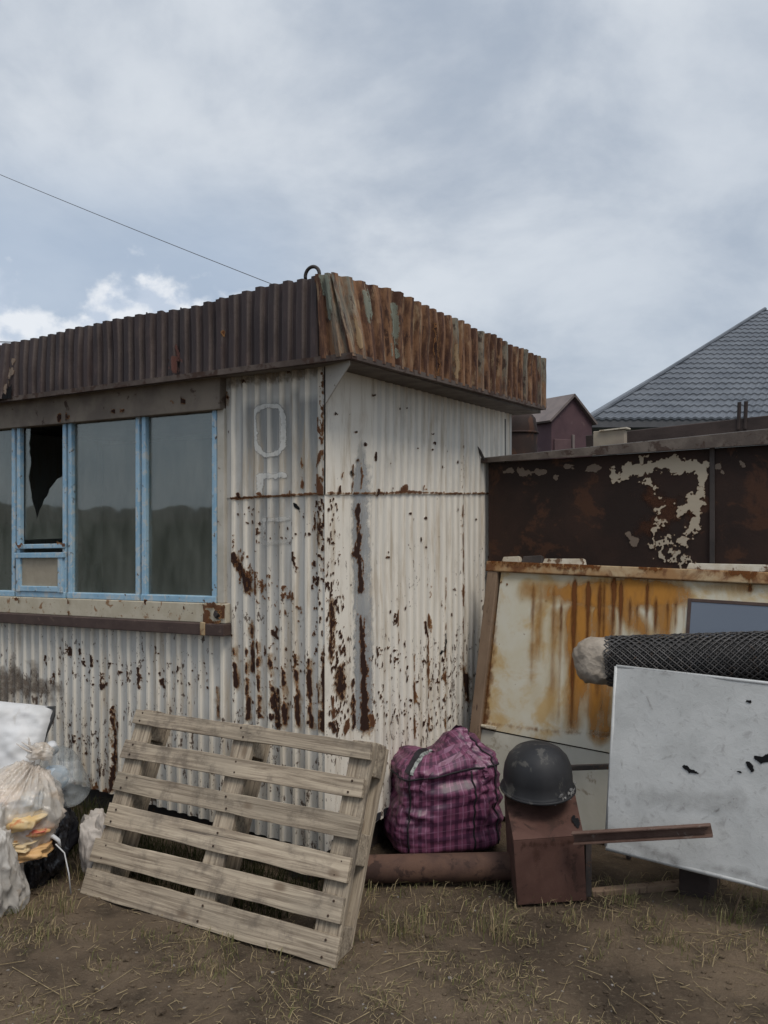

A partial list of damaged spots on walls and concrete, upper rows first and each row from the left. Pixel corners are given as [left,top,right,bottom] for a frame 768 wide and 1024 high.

peeling [502,454,724,569]
rust [641,486,693,533]
rust [202,602,225,624]
rust [230,372,489,738]
rust [726,570,757,592]
rust [44,646,220,718]
rust [483,663,492,724]
rust [490,561,691,742]
rust [69,706,118,793]